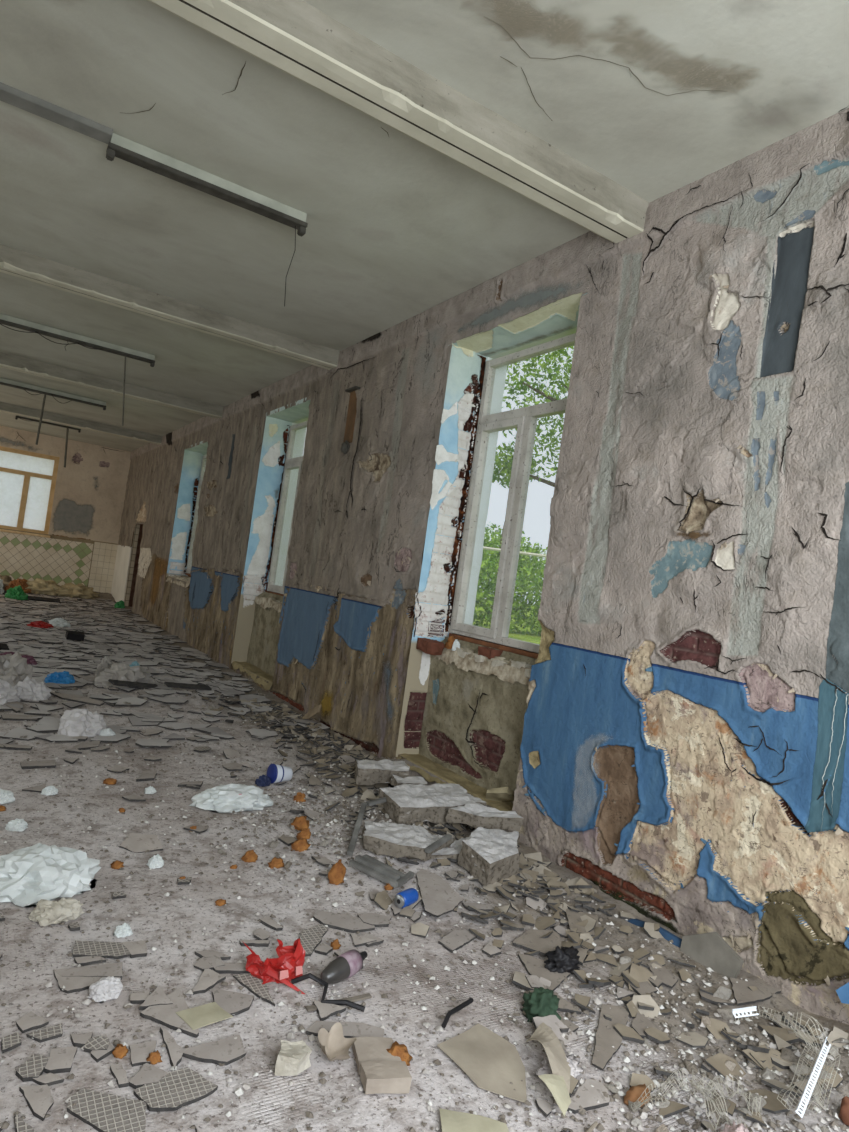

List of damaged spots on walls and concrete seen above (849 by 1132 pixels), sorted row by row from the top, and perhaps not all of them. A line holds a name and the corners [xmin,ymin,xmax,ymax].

crack [641,163,810,284]
crack [807,189,849,306]
flaking render [709,274,741,330]
flaking render [138,547,152,579]
peeling [168,374,506,779]
flaking render [679,489,723,534]
crack [664,489,743,530]
flaking render [715,541,735,570]
crack [680,533,799,616]
crack [791,513,841,549]
crack [719,726,799,786]
peeling [506,630,849,1024]